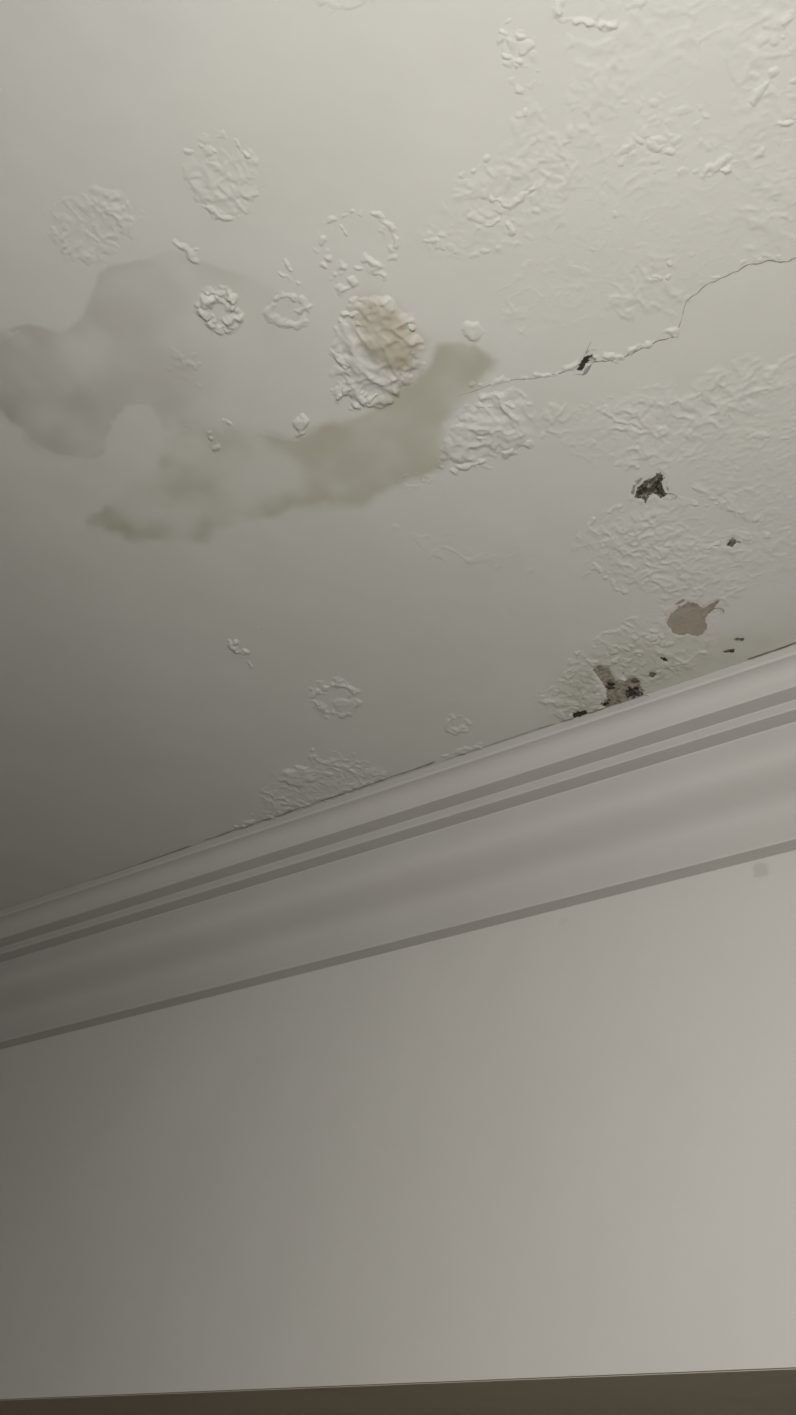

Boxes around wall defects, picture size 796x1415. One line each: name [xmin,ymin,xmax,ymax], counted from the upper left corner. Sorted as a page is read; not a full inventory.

crack [457,250,796,397]
flaking render [635,472,677,503]
peeling [534,596,749,723]